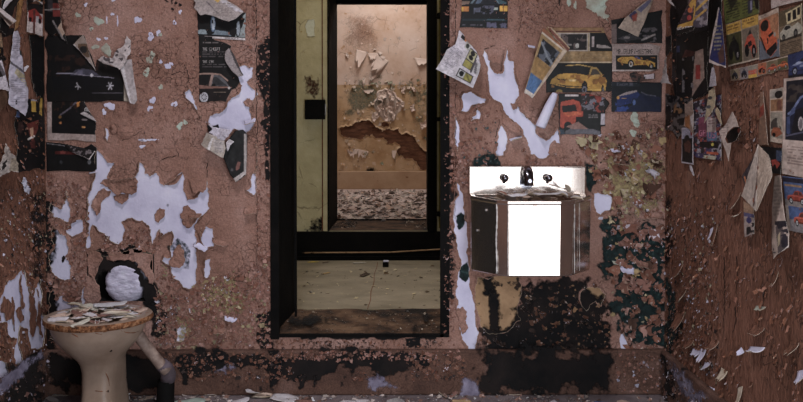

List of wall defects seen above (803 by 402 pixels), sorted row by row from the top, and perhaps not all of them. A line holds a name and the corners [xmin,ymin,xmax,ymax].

flaking render [338,43,426,171]
peeling [439,47,767,402]
damp [174,311,436,391]
peeling [723,243,803,367]
peeling [778,341,803,402]